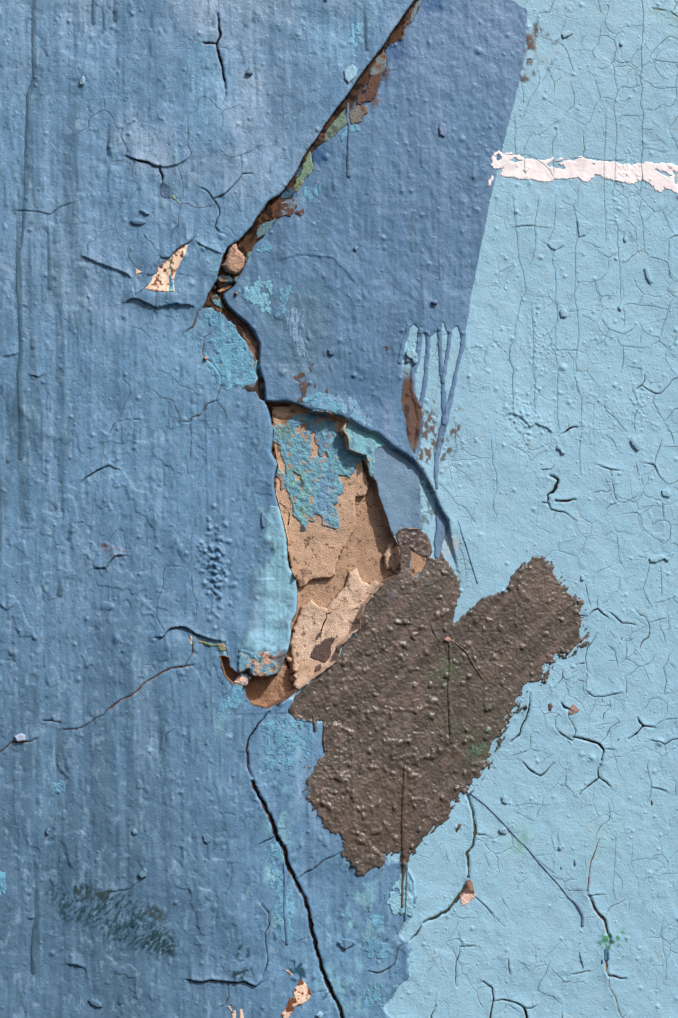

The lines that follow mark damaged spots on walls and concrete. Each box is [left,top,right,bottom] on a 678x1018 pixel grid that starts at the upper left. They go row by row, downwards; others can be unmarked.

peeling [136,245,187,292]
crack [74,0,422,363]
crack [66,327,228,585]
flaking render [189,275,401,772]
crack [369,0,678,1018]
crack [246,713,344,1018]
peeling [281,970,312,1018]